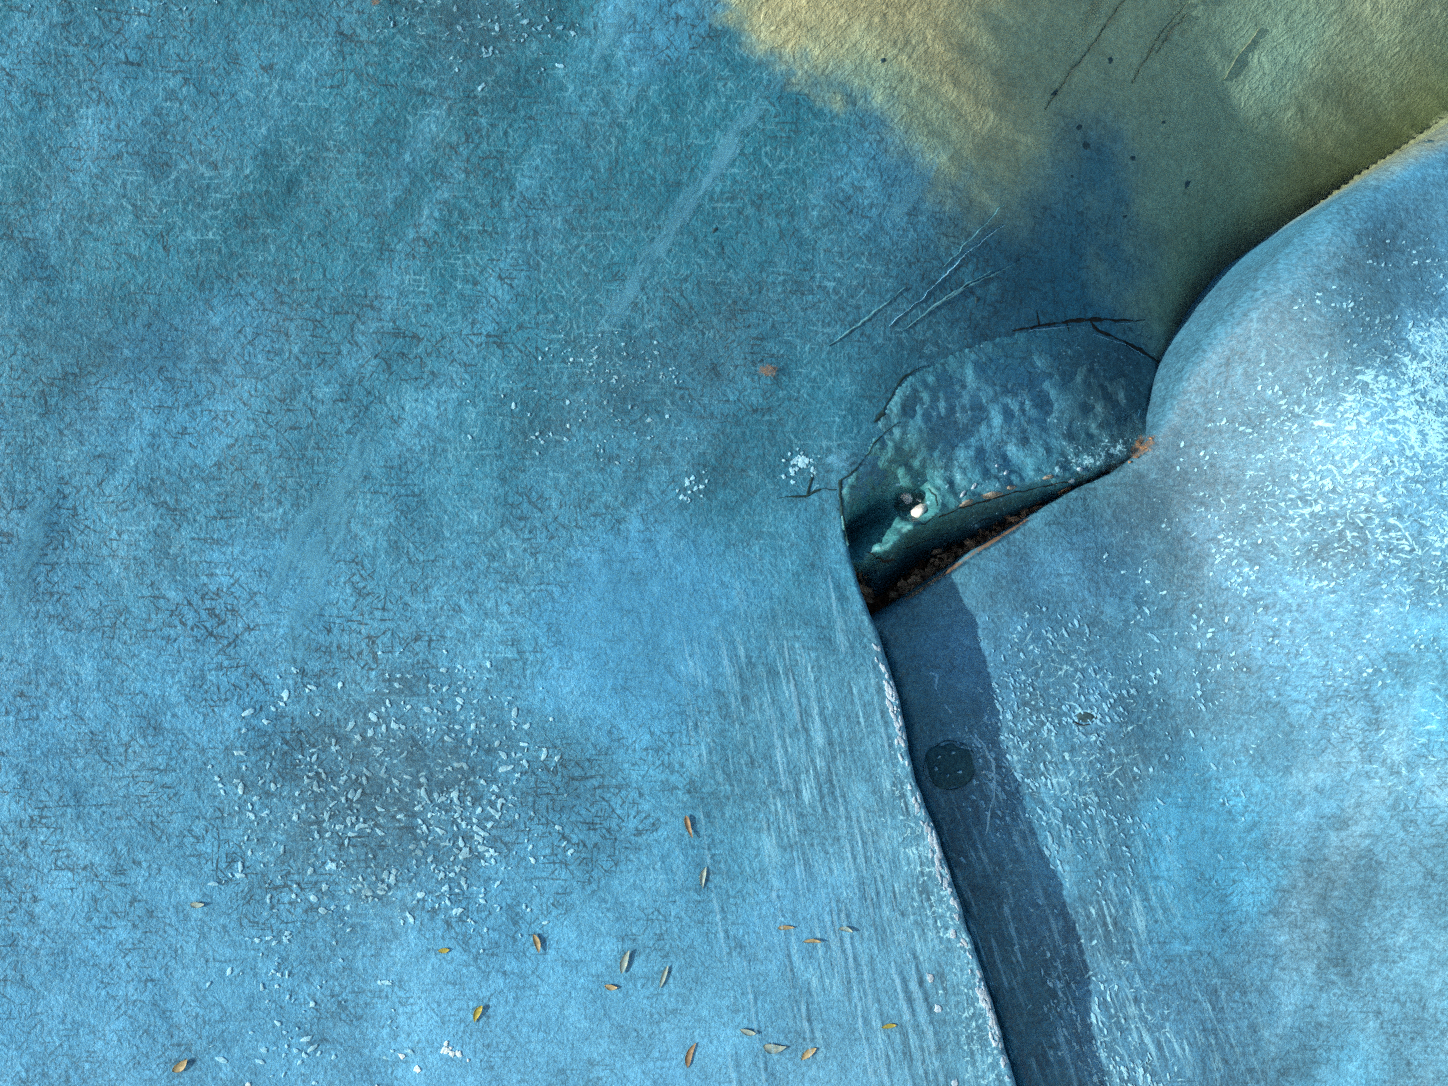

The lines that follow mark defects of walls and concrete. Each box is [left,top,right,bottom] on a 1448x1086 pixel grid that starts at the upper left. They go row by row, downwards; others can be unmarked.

crack [1013,312,1183,370]
crack [776,366,928,545]